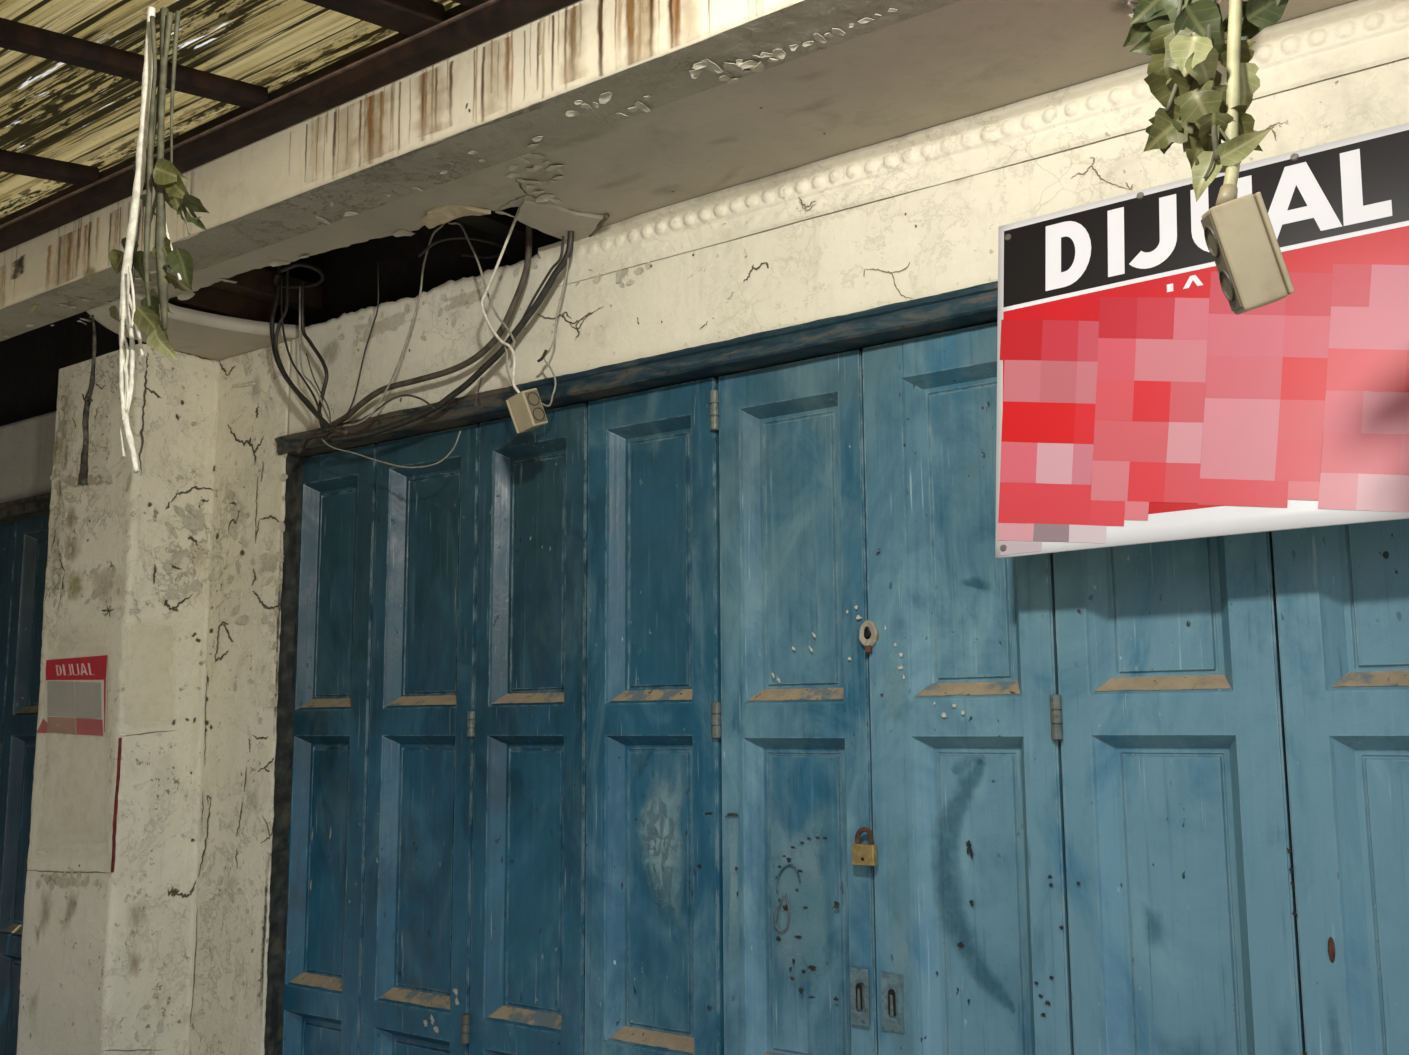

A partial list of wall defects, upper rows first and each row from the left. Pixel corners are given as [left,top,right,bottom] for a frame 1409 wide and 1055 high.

rust [537,6,576,70]
rust [598,0,680,54]
peeling [689,8,898,83]
rust [421,61,453,117]
rust [474,46,485,109]
peeling [565,92,650,117]
spalling [393,229,415,237]
spalling [177,292,195,300]
crack [537,306,604,340]
crack [139,352,235,476]
crack [153,406,286,612]
crack [126,621,274,1021]